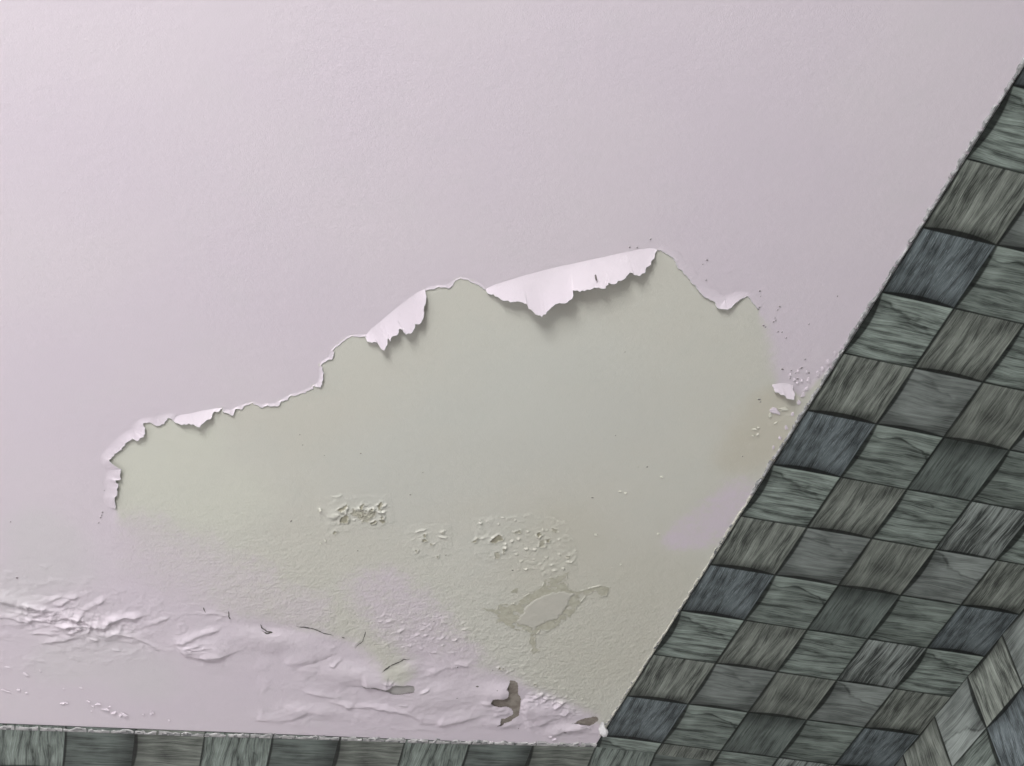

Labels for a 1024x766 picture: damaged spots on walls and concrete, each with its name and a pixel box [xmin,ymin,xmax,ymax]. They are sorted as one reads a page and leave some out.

leakage [111,295,816,726]
peeling [98,238,844,523]